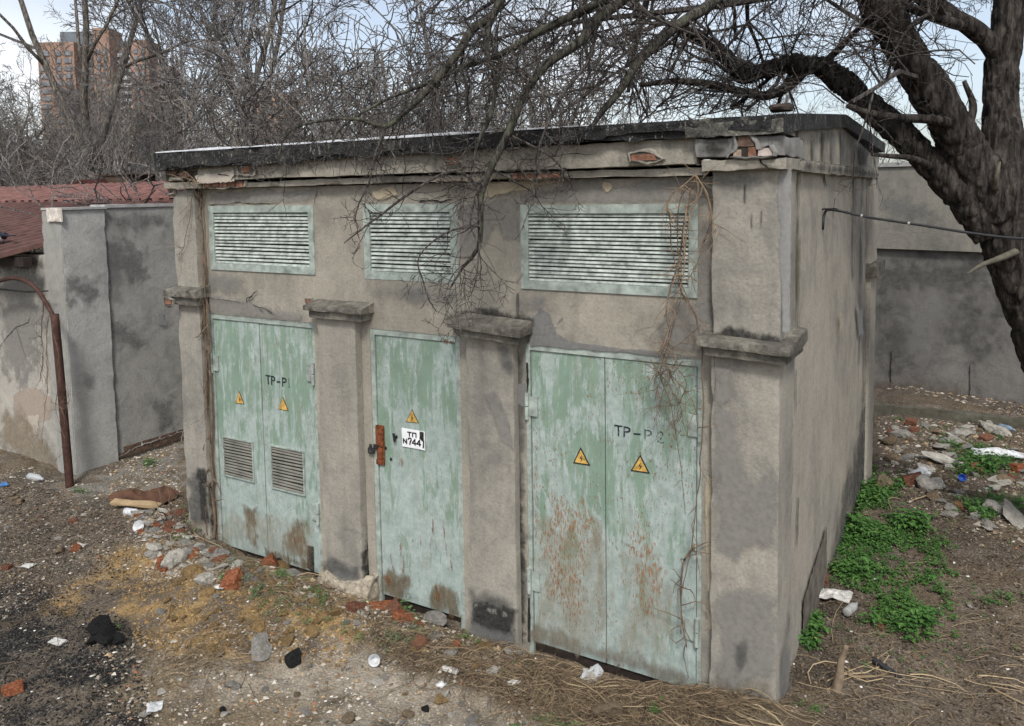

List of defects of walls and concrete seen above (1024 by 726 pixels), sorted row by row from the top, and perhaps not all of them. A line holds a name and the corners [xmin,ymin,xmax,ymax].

spalling [726,135,778,160]
peeling [165,165,257,196]
peeling [436,157,570,197]
leakage [105,213,163,282]
leakage [69,278,98,307]
leakage [469,348,527,642]
rust [244,508,256,544]
rust [266,521,307,568]
rust [383,540,421,599]
rust [534,490,598,627]
rust [625,519,664,623]
rust [430,585,458,617]